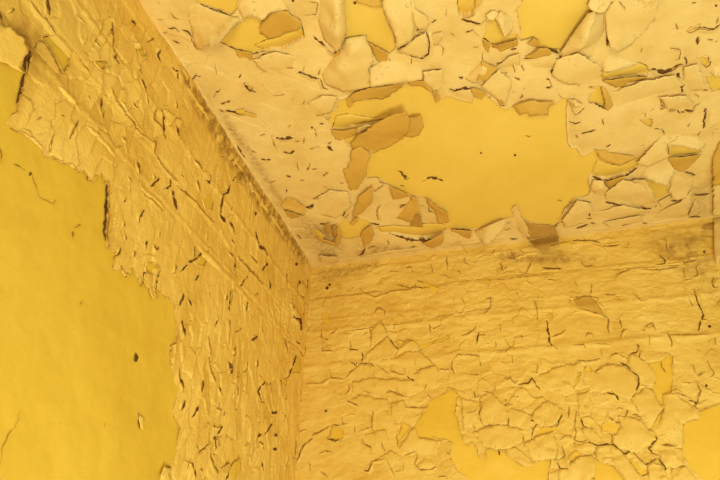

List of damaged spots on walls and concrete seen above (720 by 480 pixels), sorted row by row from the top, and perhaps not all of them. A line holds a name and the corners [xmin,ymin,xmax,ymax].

peeling [188,0,304,60]
crack [0,149,56,206]
crack [47,115,79,153]
peeling [0,23,183,480]
crack [147,0,343,225]
peeling [281,197,305,219]
crack [87,66,720,479]
peeling [313,0,720,255]
peeling [375,350,720,480]